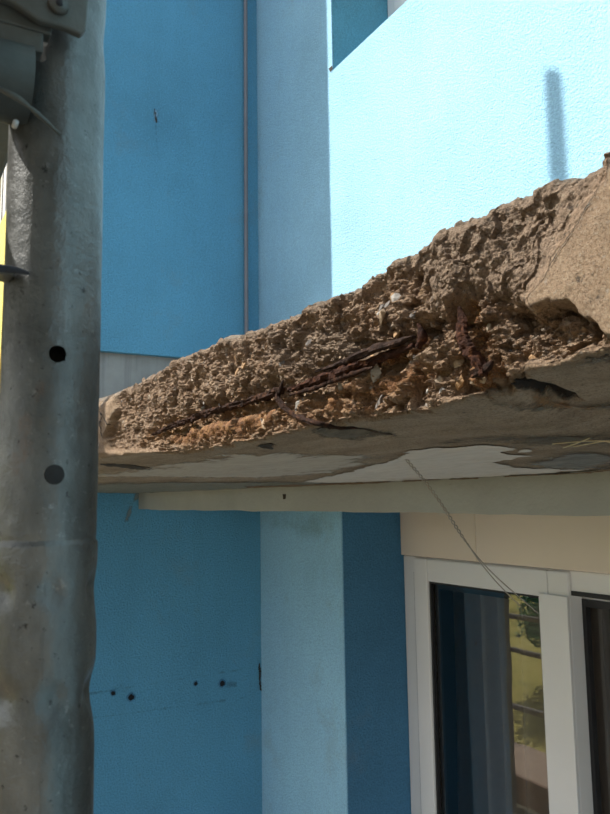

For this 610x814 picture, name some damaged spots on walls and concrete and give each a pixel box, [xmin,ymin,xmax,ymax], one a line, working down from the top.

crack [539,183,603,283]
spalling [98,151,610,488]
rust [166,407,278,443]